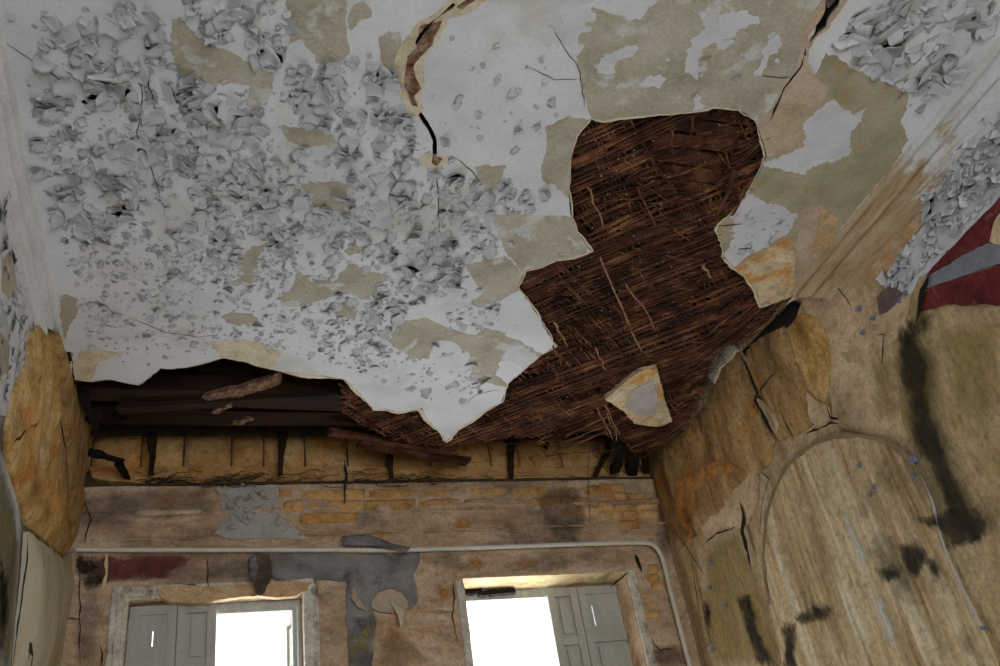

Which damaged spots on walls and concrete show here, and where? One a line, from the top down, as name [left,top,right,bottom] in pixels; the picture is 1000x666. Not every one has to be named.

crack [394,0,486,234]
crack [528,29,585,105]
crack [762,0,848,122]
spalling [28,0,1000,546]
crack [738,354,840,441]
damp [877,315,987,547]
peeling [342,534,410,553]
flaking render [351,585,408,626]
crack [669,471,769,637]
damp [703,539,830,666]
damp [881,542,938,583]